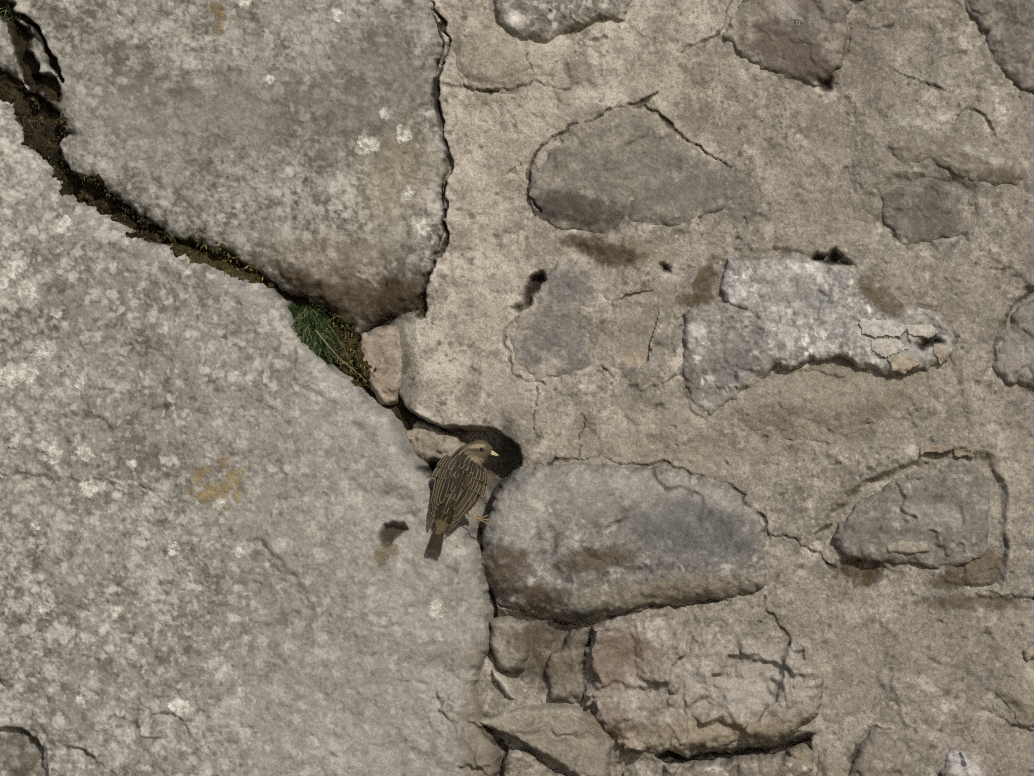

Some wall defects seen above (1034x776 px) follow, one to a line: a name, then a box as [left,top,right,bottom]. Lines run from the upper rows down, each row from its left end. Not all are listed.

crack [436,13,447,35]
crack [0,0,194,246]
crack [637,94,676,131]
crack [416,70,453,318]
crack [244,265,308,305]
crack [333,362,418,430]